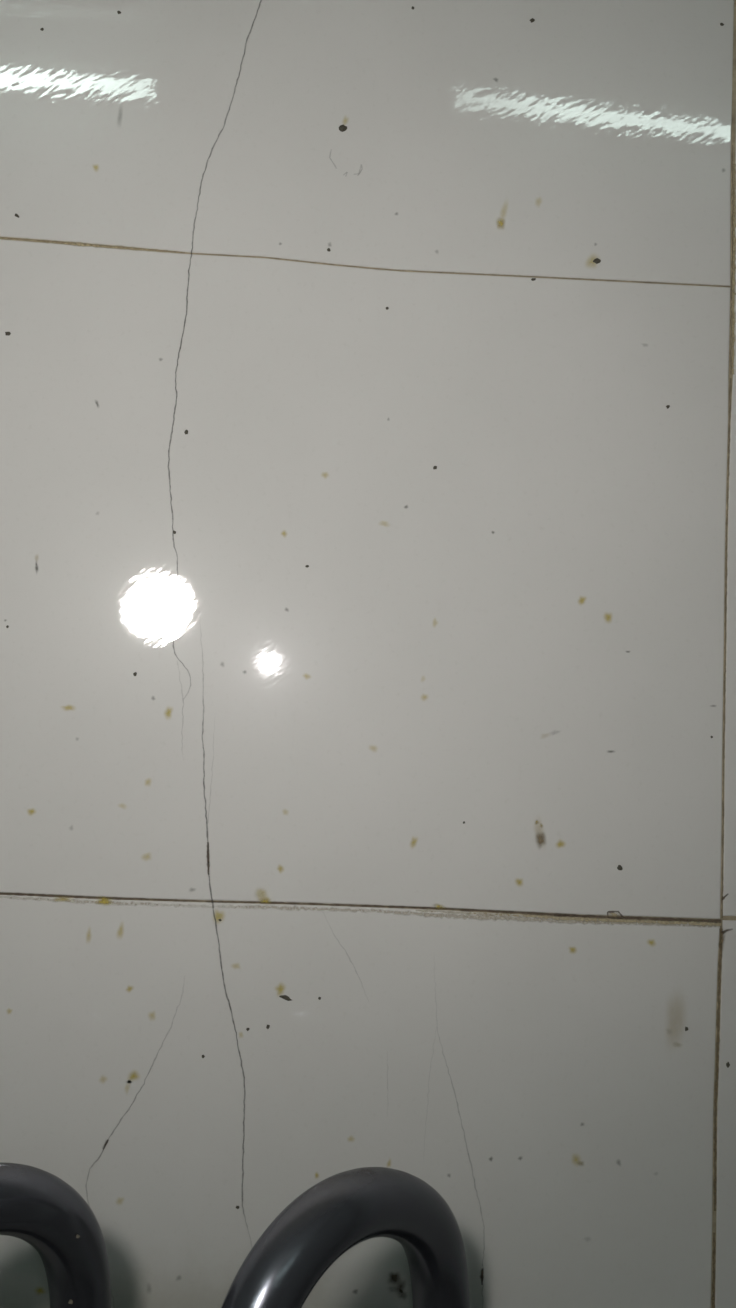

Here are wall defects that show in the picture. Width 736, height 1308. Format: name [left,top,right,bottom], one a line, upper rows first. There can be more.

crack [202,731,245,1187]